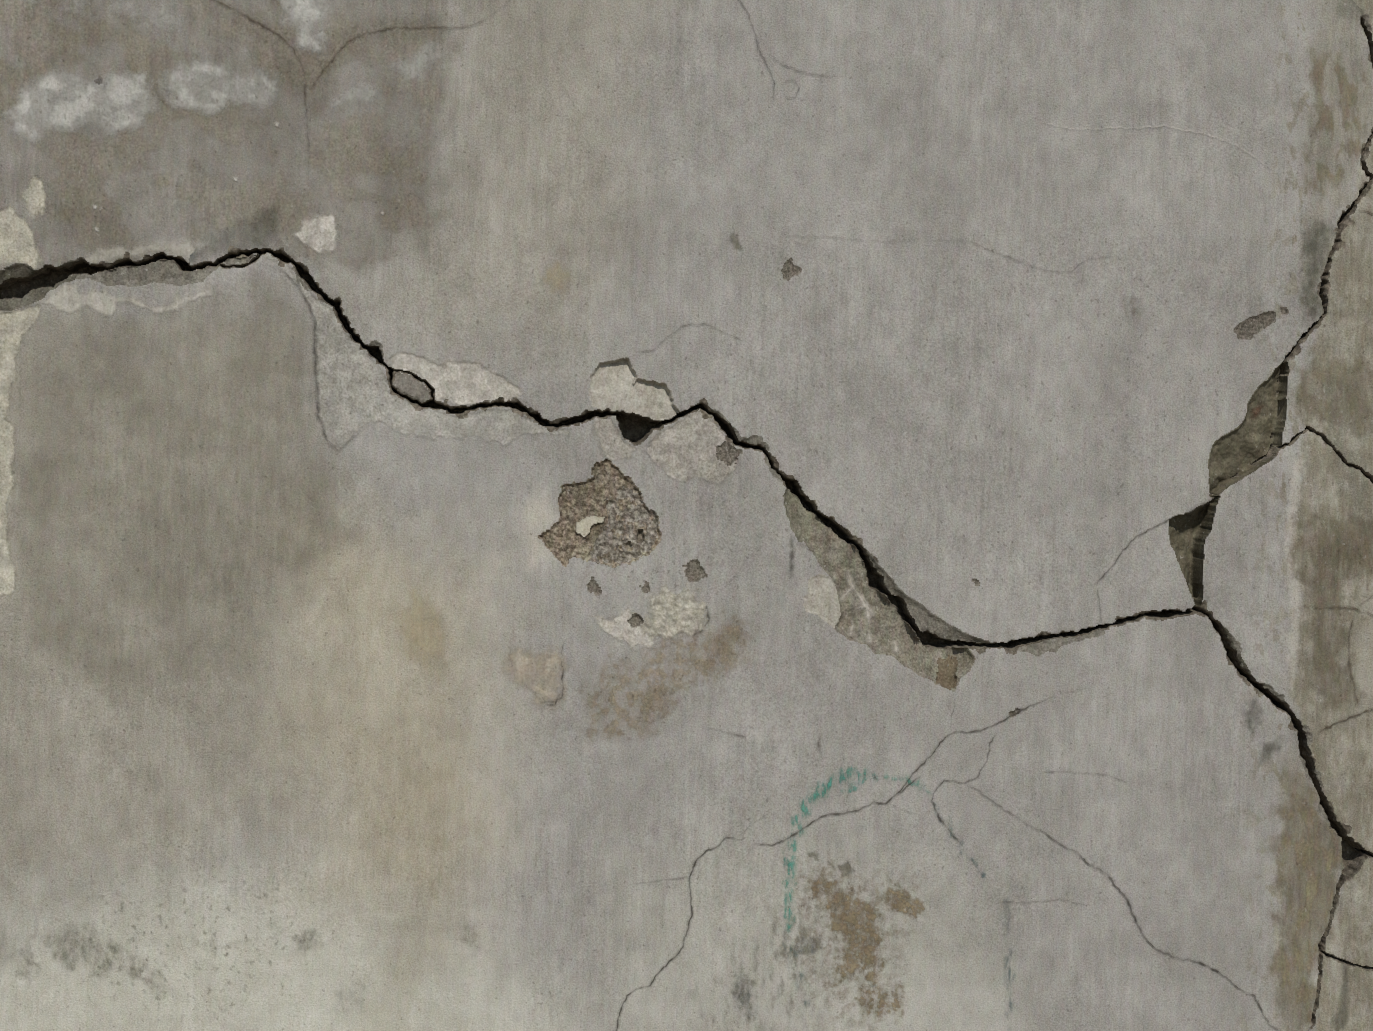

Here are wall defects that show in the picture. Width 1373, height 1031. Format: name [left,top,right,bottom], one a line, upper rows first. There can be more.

crack [1359,14,1373,68]
peeling [0,176,46,269]
peeling [295,214,338,253]
peeling [269,257,570,447]
spalling [1234,307,1289,340]
crack [1275,127,1373,397]
peeling [0,306,41,595]
spalling [538,357,743,596]
peeling [592,559,708,648]
water stain [590,626,740,735]
crack [0,246,1373,1029]
spalling [783,488,976,692]